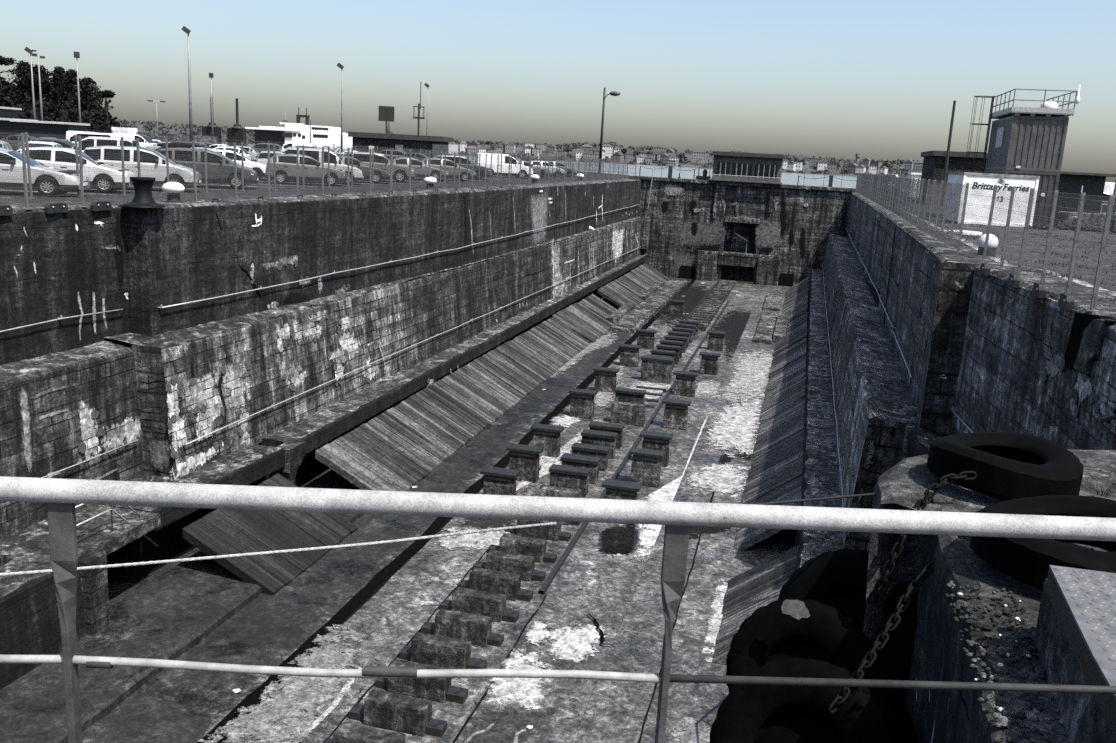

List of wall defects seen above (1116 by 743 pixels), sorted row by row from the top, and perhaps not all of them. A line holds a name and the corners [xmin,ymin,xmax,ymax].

spalling [1040,345,1114,425]